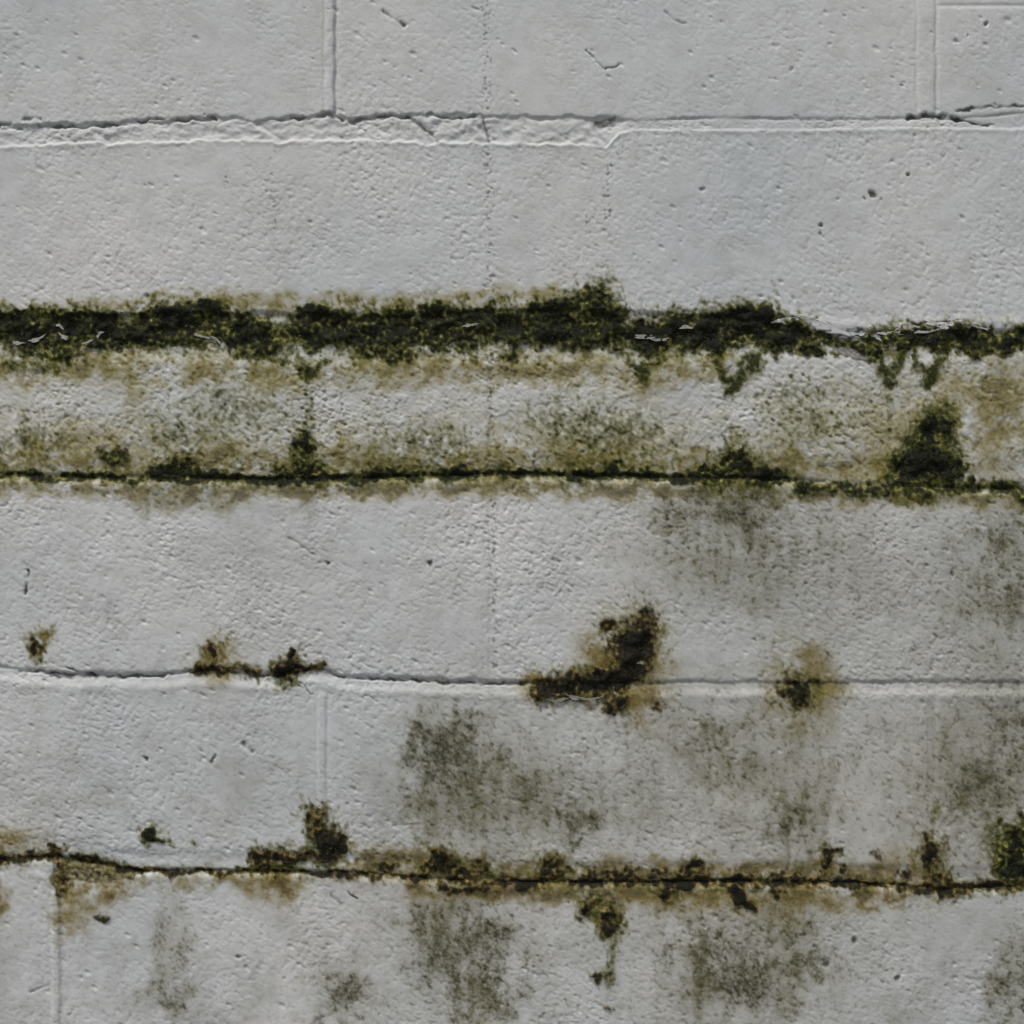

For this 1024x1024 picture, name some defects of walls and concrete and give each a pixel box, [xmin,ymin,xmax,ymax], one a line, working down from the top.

crack [906,107,987,126]
damp [219,293,293,310]
peeling [771,314,990,361]
damp [0,350,993,563]
damp [401,700,512,833]
damp [938,701,1024,831]
damp [515,773,604,851]
damp [765,789,828,855]